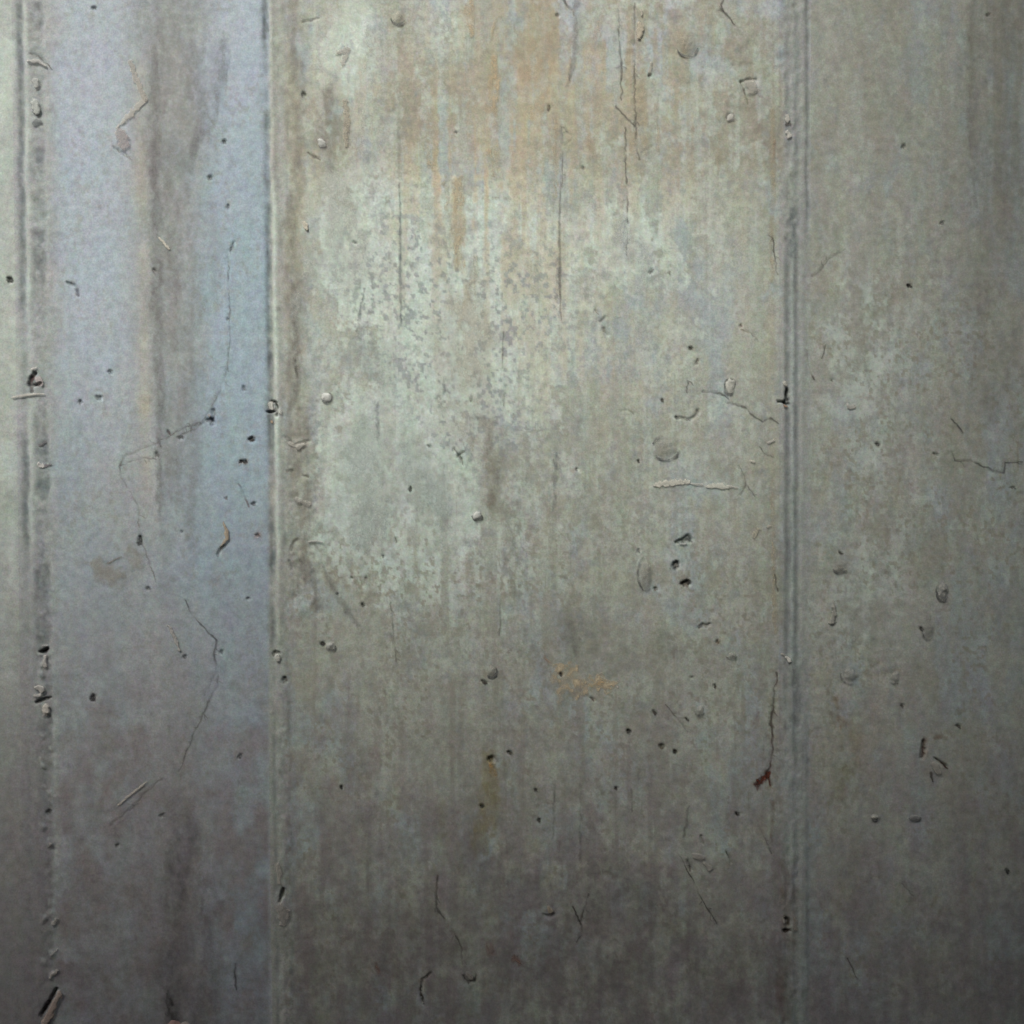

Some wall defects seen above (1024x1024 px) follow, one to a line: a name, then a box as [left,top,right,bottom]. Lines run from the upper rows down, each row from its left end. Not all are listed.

crack [769,672,778,769]